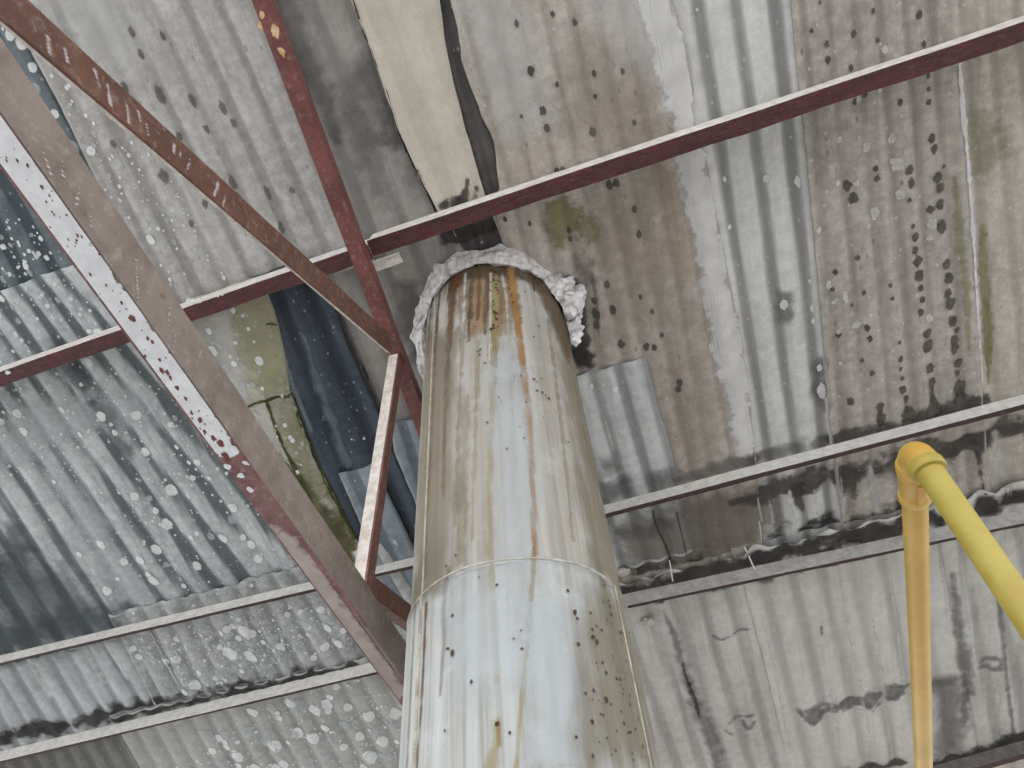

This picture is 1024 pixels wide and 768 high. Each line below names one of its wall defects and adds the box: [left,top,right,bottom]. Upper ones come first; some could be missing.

water stain [439,179,478,209]
water stain [440,216,507,245]
water stain [825,63,991,444]
water stain [303,335,351,466]
rust [428,263,570,768]
water stain [600,452,903,594]
water stain [929,510,946,528]
water stain [921,414,1024,517]
rust [573,599,639,759]
water stain [797,683,910,726]